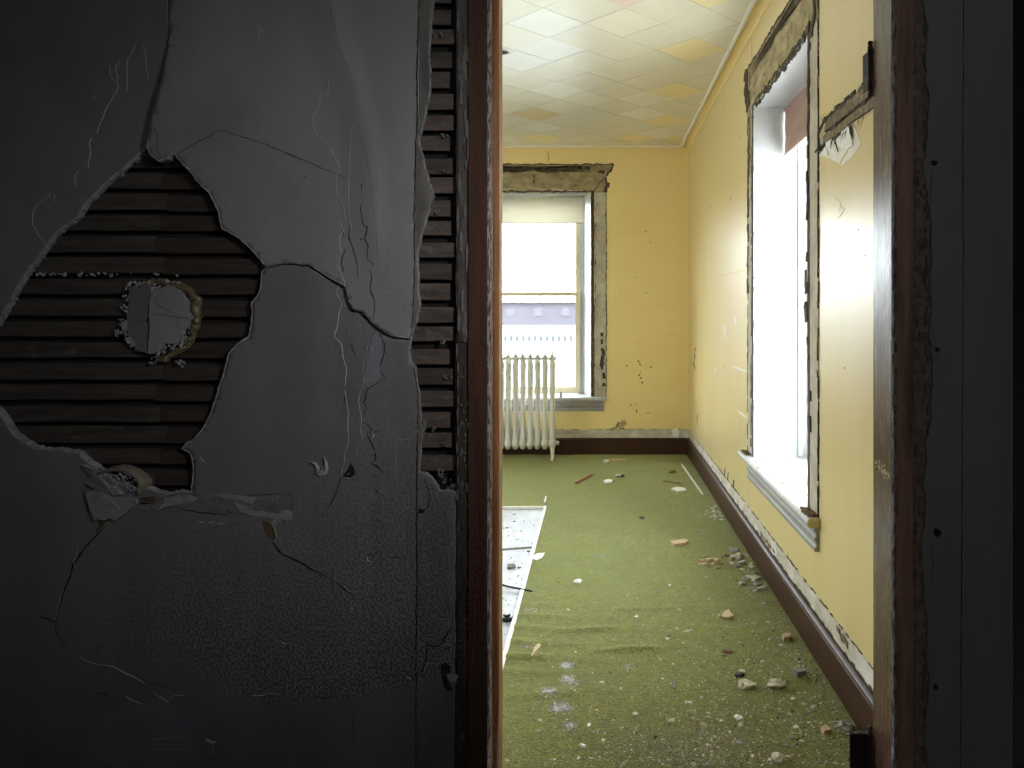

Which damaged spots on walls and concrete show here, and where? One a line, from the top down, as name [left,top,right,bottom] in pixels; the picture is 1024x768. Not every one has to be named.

crack [40,519,183,705]
spalling [0,136,295,542]
crack [151,0,453,768]
flaking render [410,0,469,503]
flaking render [505,414,873,693]
flaking render [814,123,862,165]